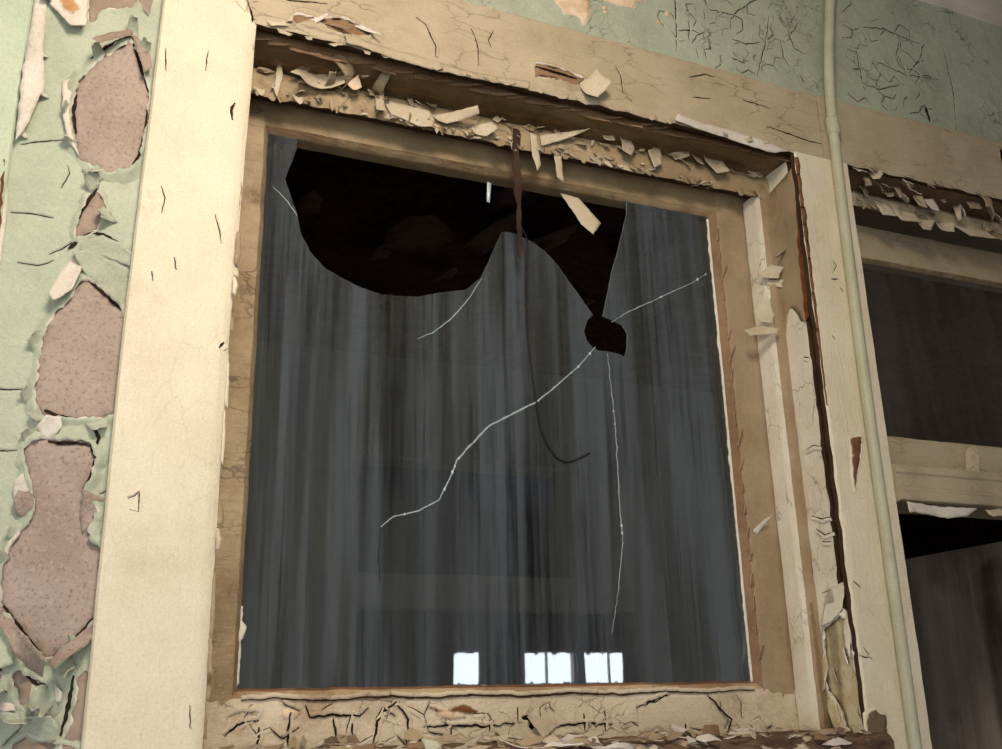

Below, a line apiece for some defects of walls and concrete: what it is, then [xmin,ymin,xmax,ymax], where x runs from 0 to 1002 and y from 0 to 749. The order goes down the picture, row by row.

peeling [553,0,643,29]
crack [655,0,821,144]
crack [840,0,959,132]
peeling [251,10,806,336]
peeling [852,164,1002,240]
peeling [232,232,242,295]
peeling [0,0,154,749]
peeling [238,621,247,644]
peeling [300,582,890,749]
crack [832,646,874,682]
crack [188,704,196,729]
crack [222,686,772,749]